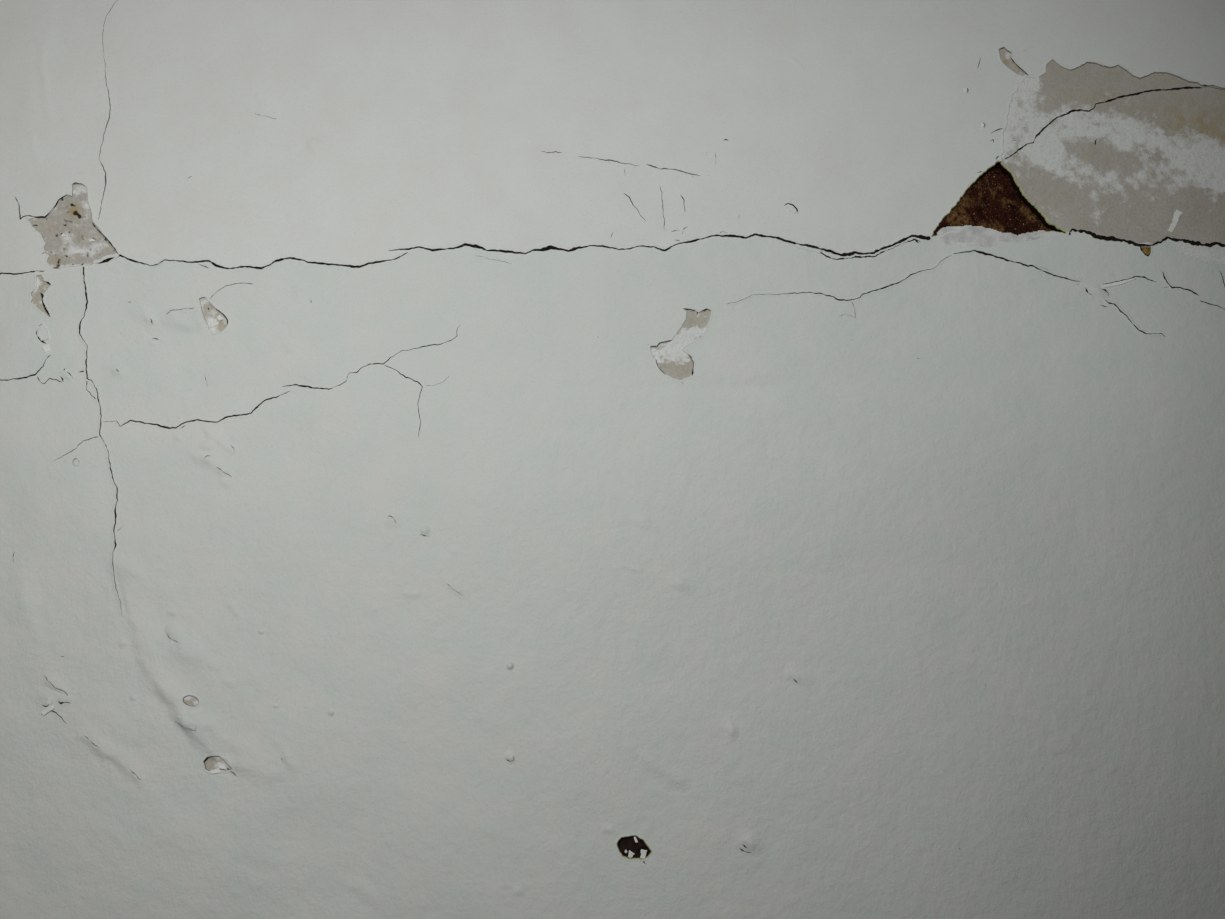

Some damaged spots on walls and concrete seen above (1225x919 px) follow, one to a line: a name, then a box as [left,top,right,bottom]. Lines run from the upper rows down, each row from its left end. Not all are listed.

crack [98,4,114,219]
peeling [930,45,1225,257]
crack [1005,85,1221,159]
flaking render [9,180,120,352]
spalling [166,283,252,335]
spalling [648,306,714,382]
crack [0,228,1225,616]
peeling [201,753,236,776]
spalling [615,833,654,863]